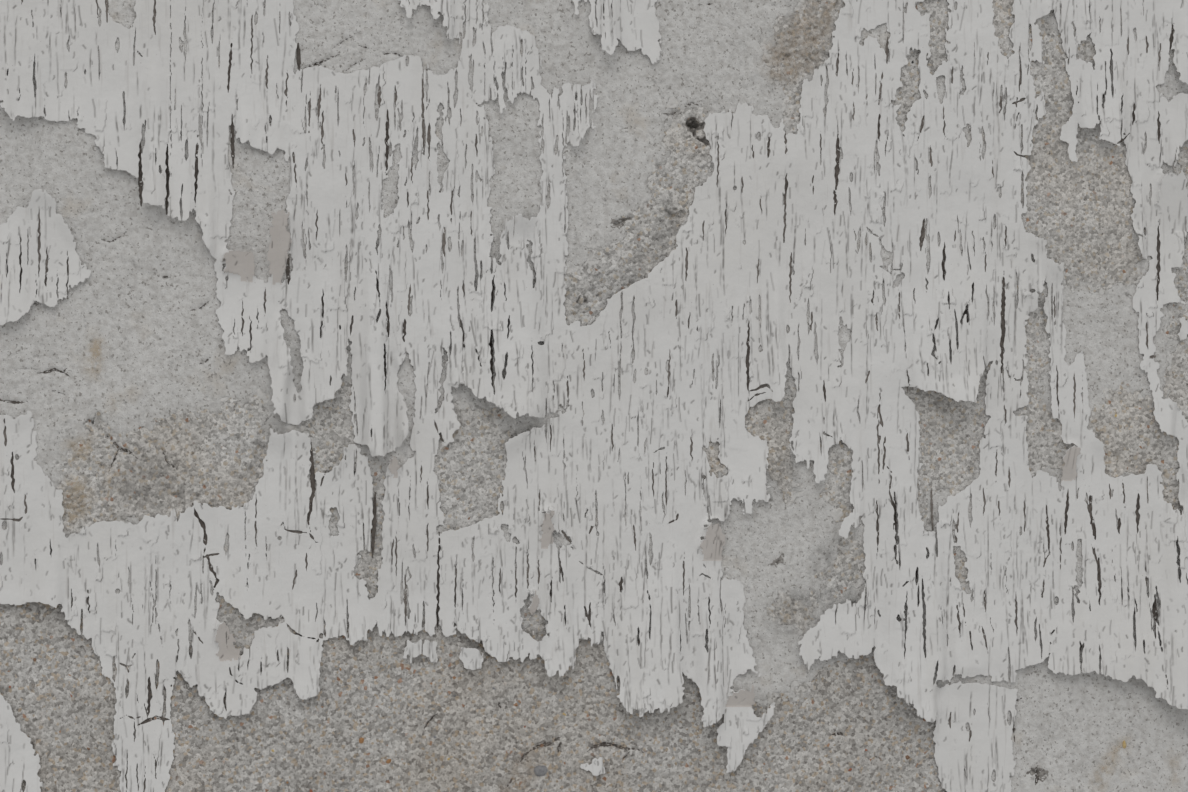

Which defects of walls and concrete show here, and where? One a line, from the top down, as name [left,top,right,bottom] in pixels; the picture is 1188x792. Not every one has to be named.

peeling [572,0,662,64]
peeling [0,189,91,325]
peeling [142,161,167,209]
spalling [563,97,715,326]
spalling [1022,14,1146,299]
peeling [465,338,546,418]
peeling [912,341,986,403]
spalling [51,389,274,538]
spalling [0,602,121,792]
spalling [165,611,947,792]
peeling [883,634,1018,792]
peeling [1041,639,1120,680]